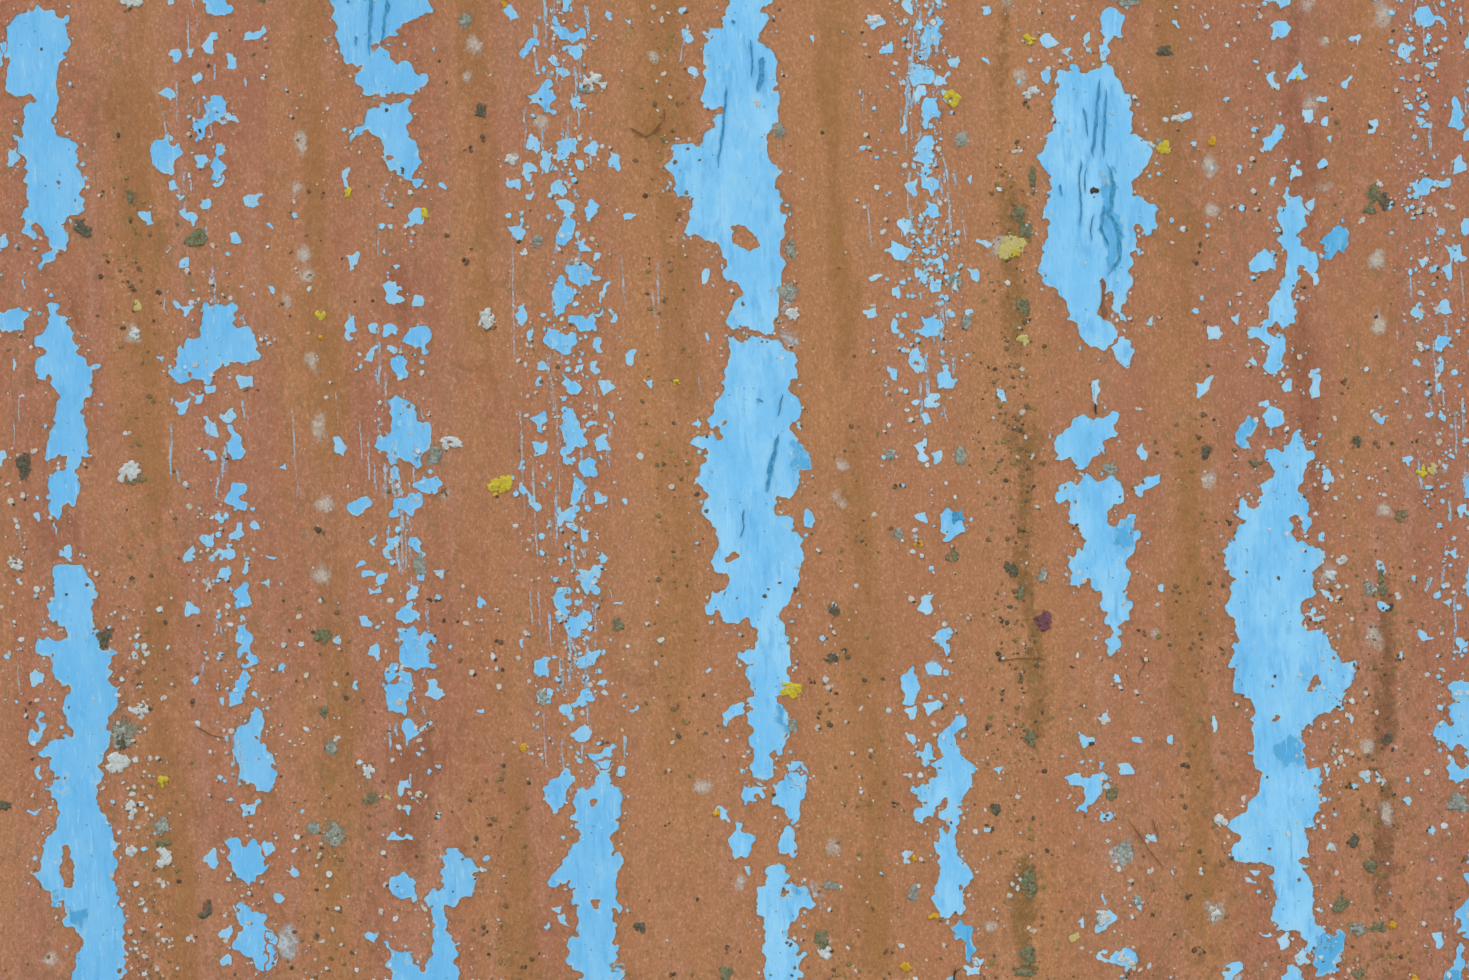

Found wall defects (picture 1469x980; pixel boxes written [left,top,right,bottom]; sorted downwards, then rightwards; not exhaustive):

peeling [0,1,137,980]
peeling [157,286,299,980]
peeling [324,0,447,229]
peeling [344,249,445,756]
peeling [364,838,490,980]
peeling [503,0,637,980]
peeling [657,0,827,980]
peeling [863,0,980,464]
peeling [894,594,1003,980]
peeling [1059,710,1135,822]
peeling [1030,2,1171,682]
peeling [1207,0,1364,980]